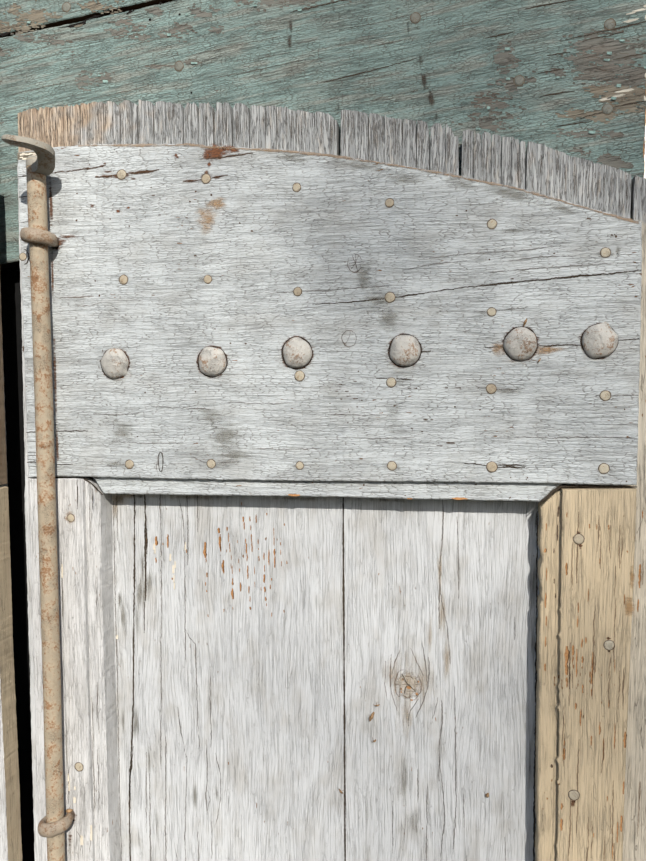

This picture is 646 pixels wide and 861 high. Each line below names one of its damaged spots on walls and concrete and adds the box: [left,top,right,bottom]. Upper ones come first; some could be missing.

peeling [0,0,224,46]
crack [0,15,429,182]
peeling [452,5,646,169]
peeling [17,152,36,160]
rust [185,144,239,182]
crack [278,245,641,304]
crack [464,462,525,470]
peeling [146,534,176,589]
peeling [217,513,287,617]
crack [569,512,625,703]
crack [408,499,467,861]
crack [562,716,615,861]